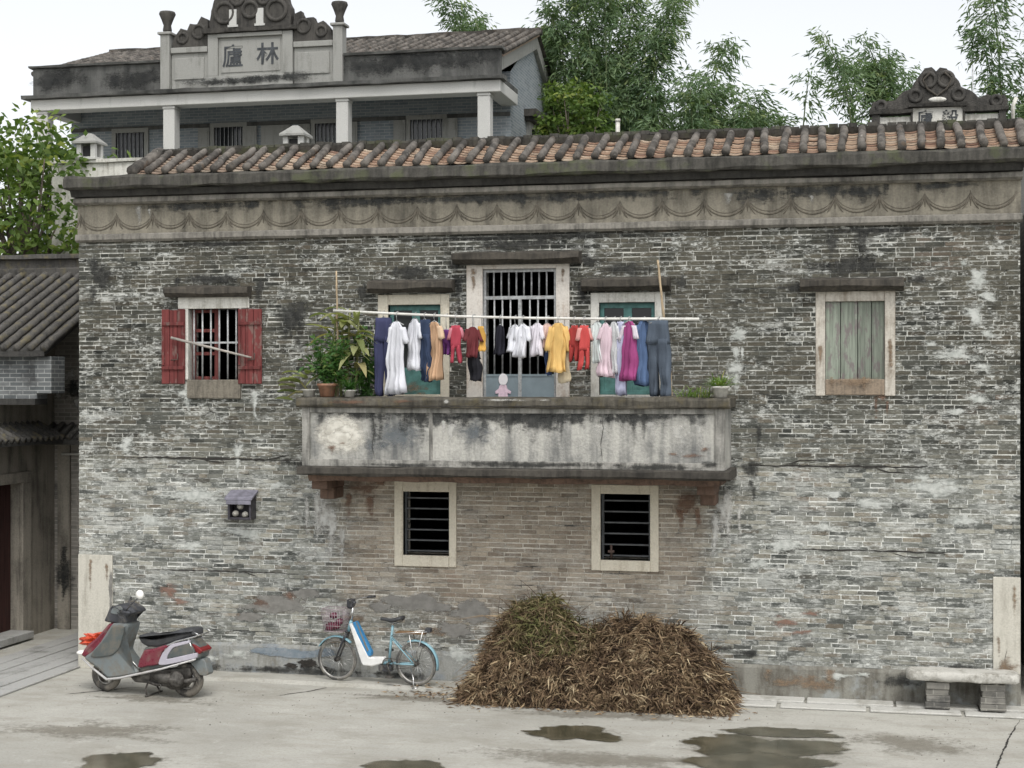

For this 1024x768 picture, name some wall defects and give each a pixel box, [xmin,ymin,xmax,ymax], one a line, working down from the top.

damp [917,182,976,190]
damp [322,190,667,209]
damp [726,184,889,204]
damp [137,201,259,214]
damp [318,384,705,449]
crack [132,455,299,463]
crack [750,460,937,474]